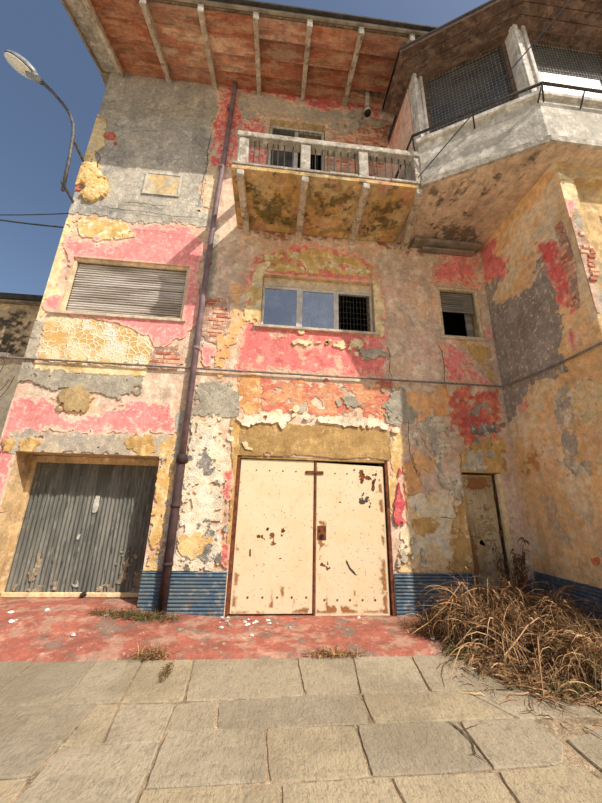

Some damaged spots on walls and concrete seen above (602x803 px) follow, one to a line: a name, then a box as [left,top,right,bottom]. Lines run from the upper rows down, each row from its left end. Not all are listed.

crack [104,135,211,235]
damp [245,182,292,240]
damp [315,192,351,215]
damp [363,201,400,236]
damp [0,312,30,354]
flaking render [0,72,602,593]
rust [353,469,383,512]
rust [369,560,388,613]